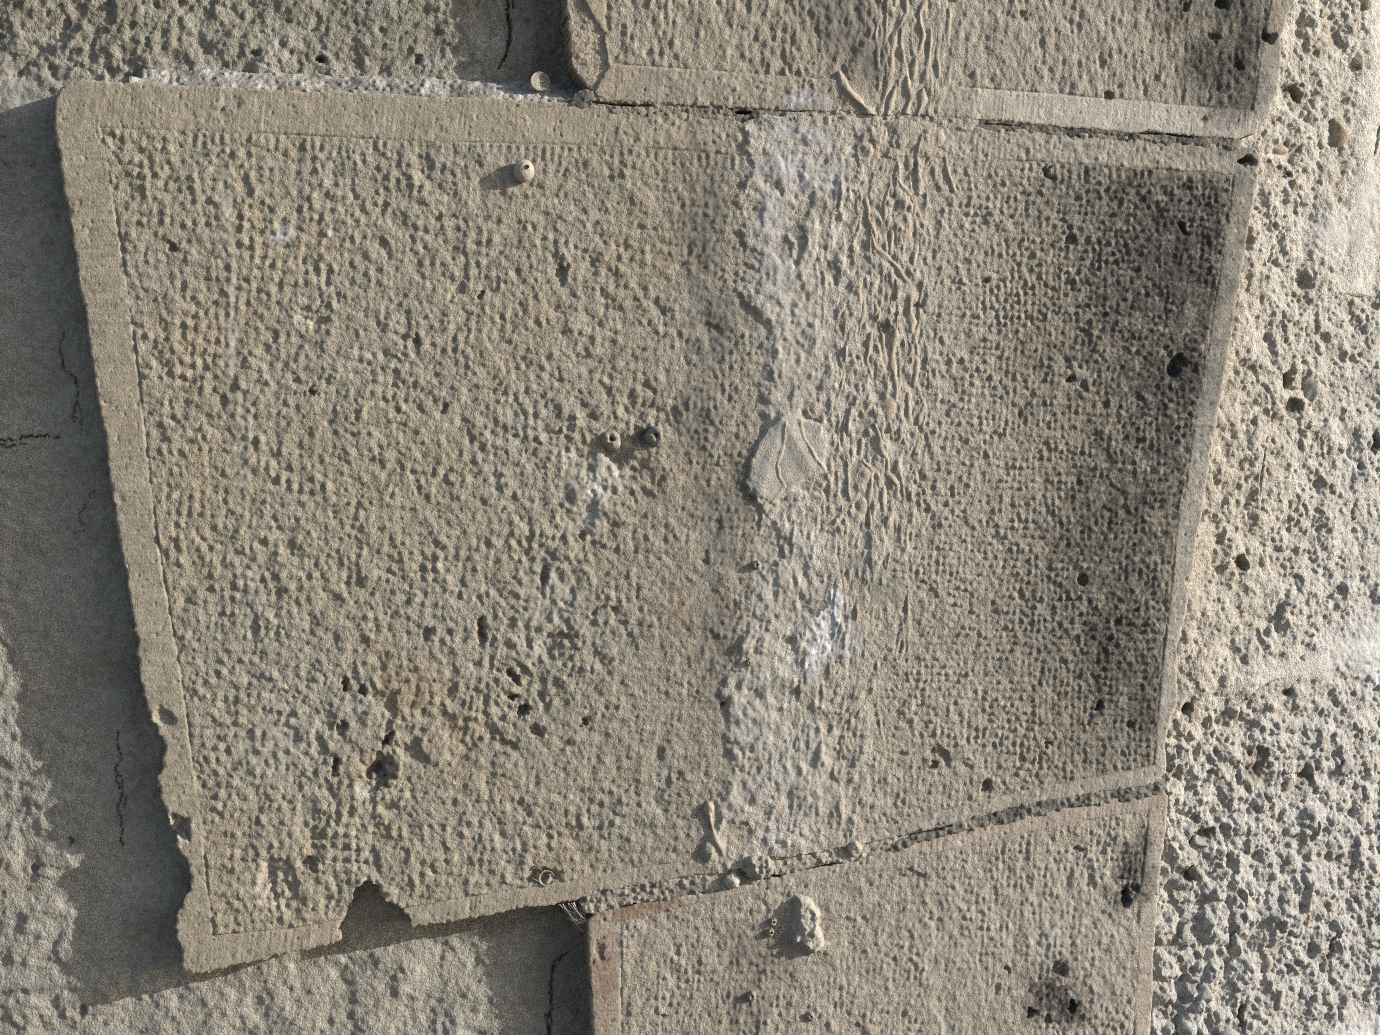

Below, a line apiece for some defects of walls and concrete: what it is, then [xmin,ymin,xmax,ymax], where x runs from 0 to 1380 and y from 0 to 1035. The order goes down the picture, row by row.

crack [500,0,514,63]
damp [755,0,960,570]
damp [694,299,730,357]
crack [0,435,32,448]
damp [798,586,858,676]
spalling [153,704,178,735]
spalling [334,720,348,737]
damp [706,621,771,782]
damp [794,743,830,813]
spalling [169,812,191,843]
spalling [297,856,321,873]
crack [545,955,563,1035]